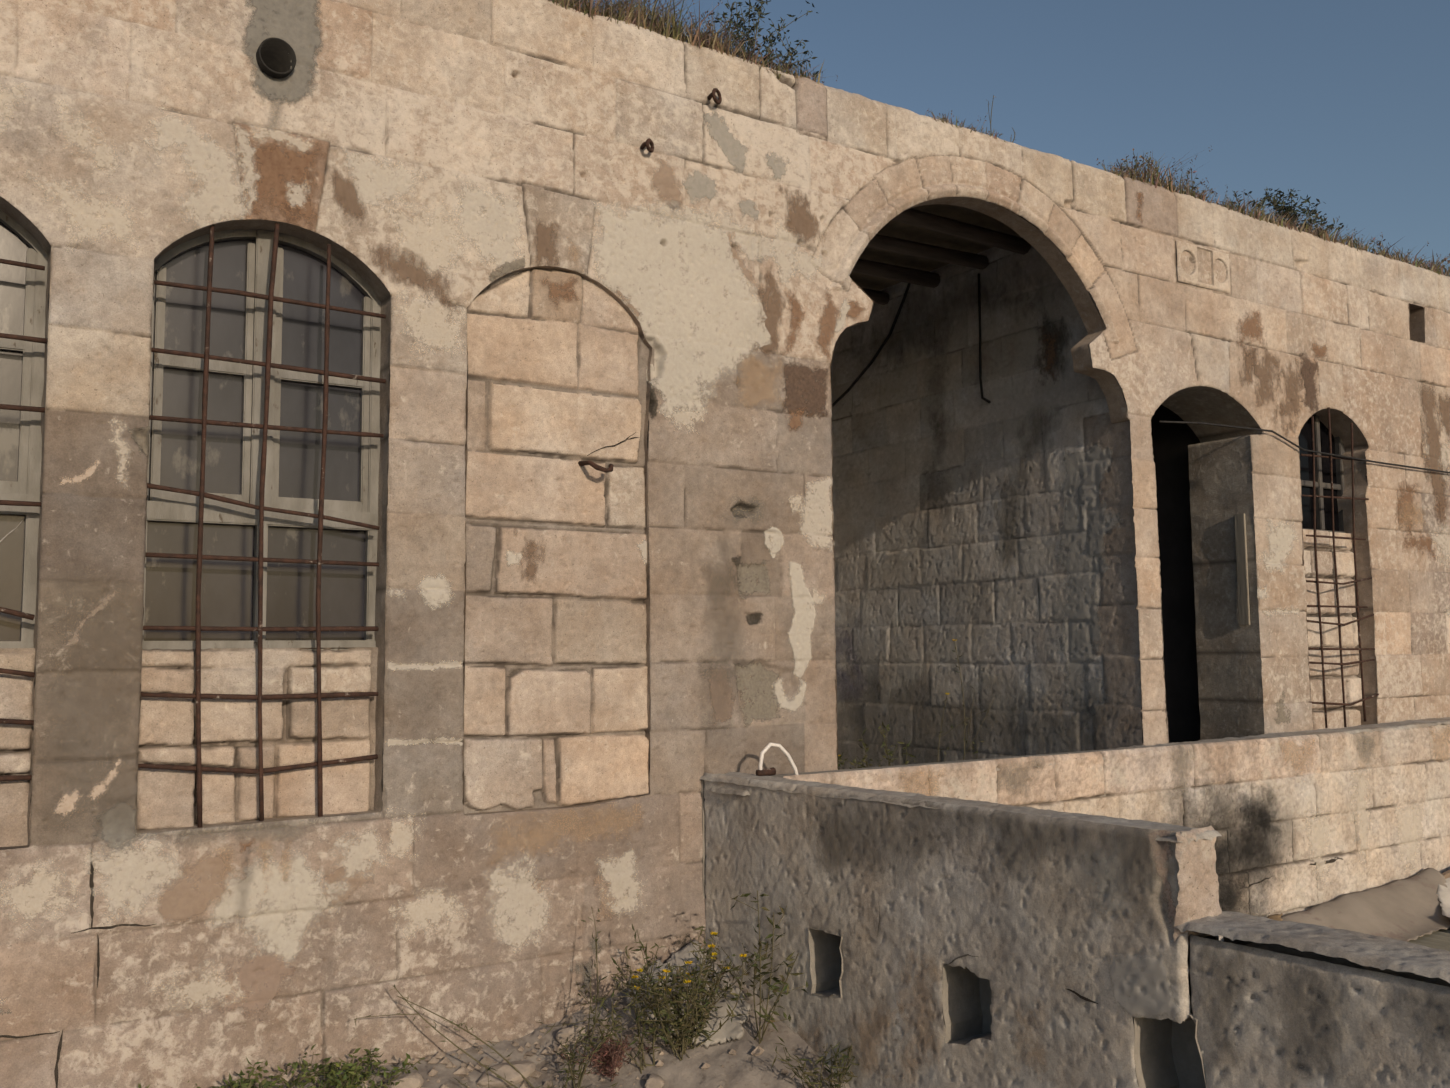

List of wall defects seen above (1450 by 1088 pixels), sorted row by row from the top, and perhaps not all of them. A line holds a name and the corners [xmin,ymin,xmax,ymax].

leakage [653,159,683,202]
leakage [727,233,864,429]
leakage [1240,312,1327,435]
spalling [731,499,760,518]
peeling [788,478,832,548]
leakage [1398,385,1450,530]